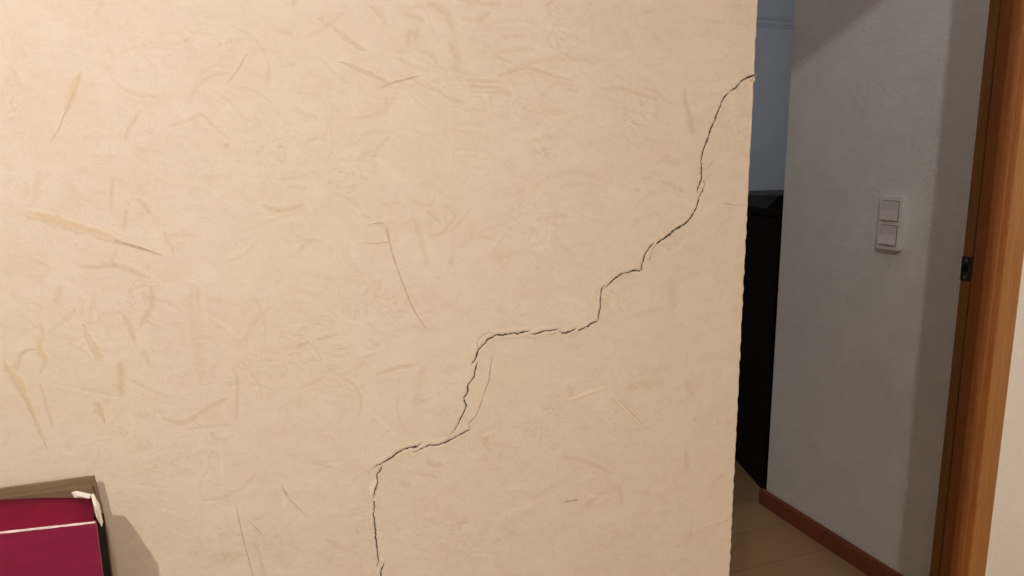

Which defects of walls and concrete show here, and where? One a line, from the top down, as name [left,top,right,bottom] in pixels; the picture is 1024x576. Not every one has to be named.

crack [368,74,757,576]